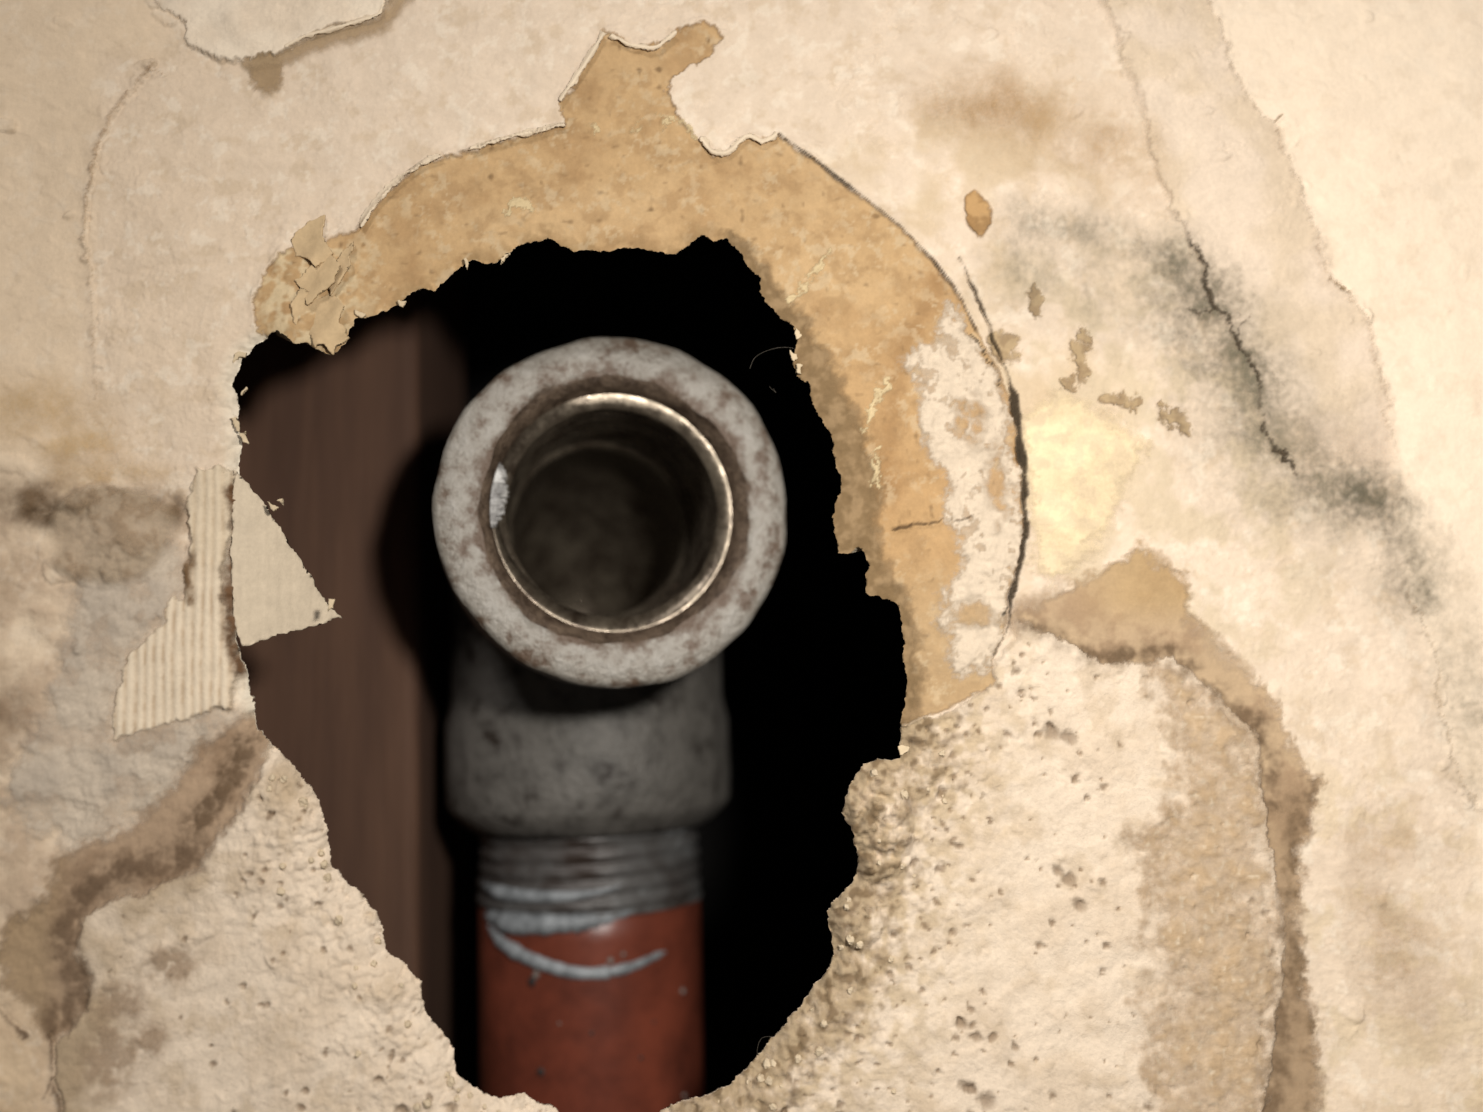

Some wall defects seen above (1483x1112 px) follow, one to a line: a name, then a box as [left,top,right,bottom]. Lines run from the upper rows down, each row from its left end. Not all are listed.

peeling [156,0,405,92]
crack [778,133,856,191]
peeling [965,190,992,236]
spalling [276,215,366,355]
damp [16,485,59,523]
spalling [230,387,250,444]
spalling [230,470,342,646]
crack [891,218,1029,650]
crack [1190,241,1297,475]
flaking render [463,235,1322,1112]
flaking render [0,540,558,1112]